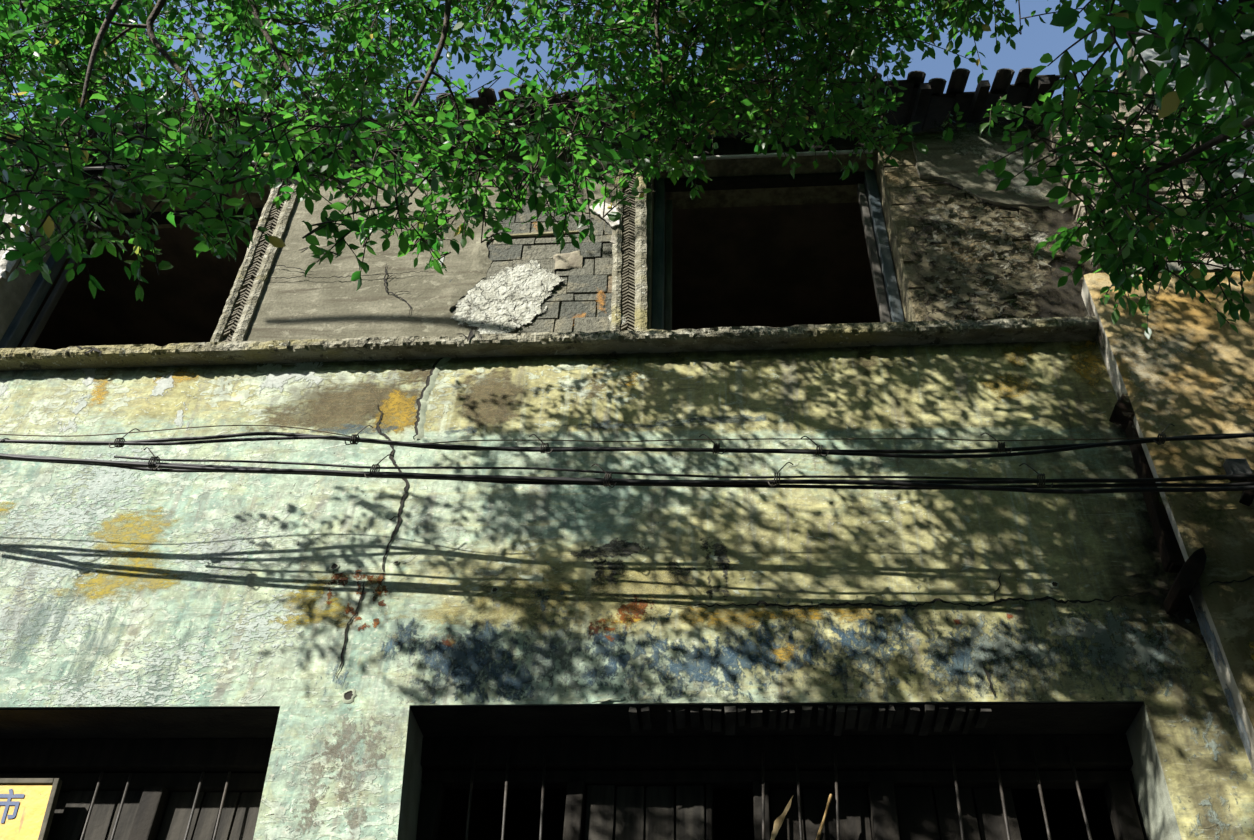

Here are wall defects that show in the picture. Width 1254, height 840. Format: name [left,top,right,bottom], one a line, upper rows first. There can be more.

spalling [450,200,626,334]
spalling [911,96,1254,321]
peeling [0,445,312,707]
crack [336,331,474,677]
peeling [379,578,1251,761]
crack [676,571,1170,608]
crack [983,666,995,696]